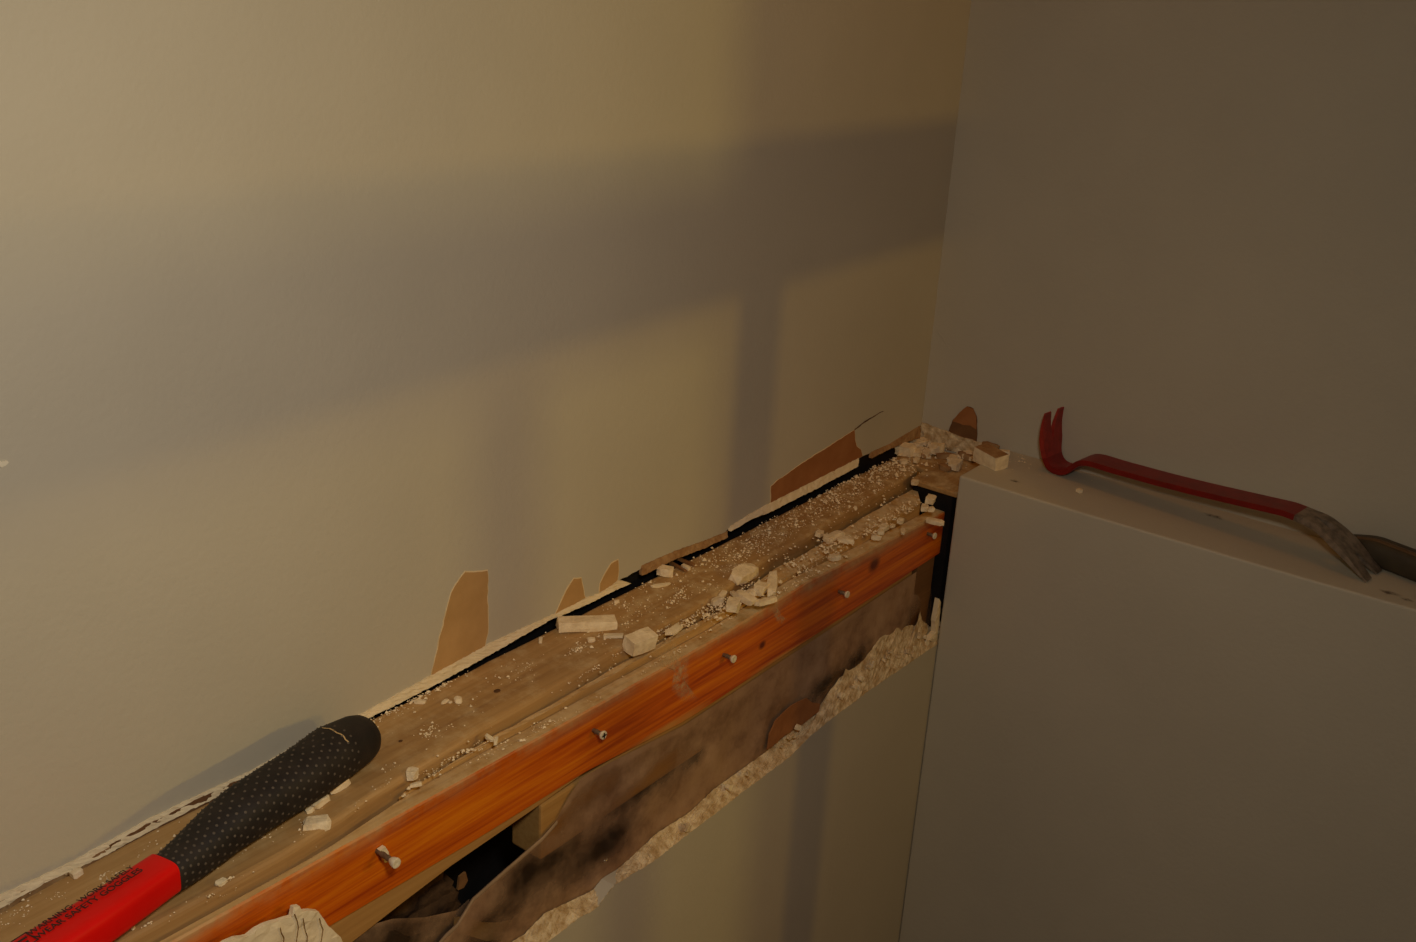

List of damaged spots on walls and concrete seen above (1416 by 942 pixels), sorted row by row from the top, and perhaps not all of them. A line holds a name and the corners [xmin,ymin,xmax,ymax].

flaking render [359,422,982,718]
flaking render [0,751,285,914]
spalling [220,904,343,942]
spalling [512,597,943,942]